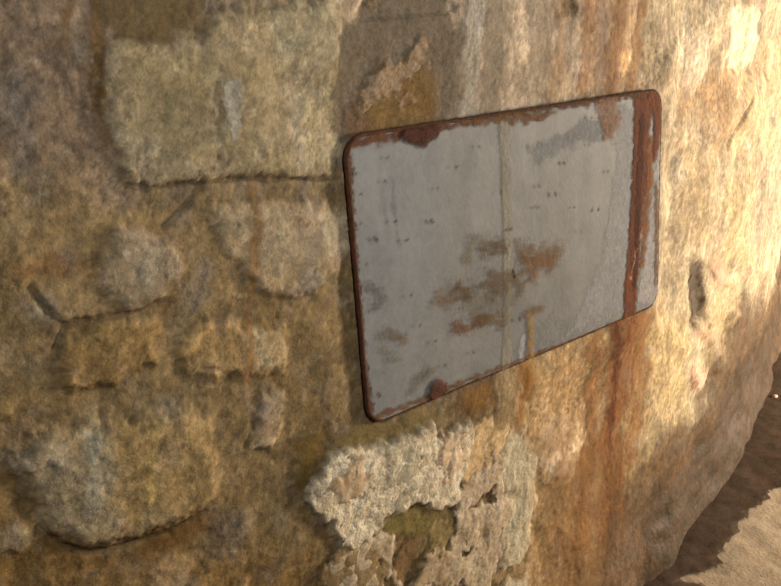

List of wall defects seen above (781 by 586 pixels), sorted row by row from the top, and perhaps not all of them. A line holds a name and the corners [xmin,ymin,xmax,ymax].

spalling [306,417,514,586]
rust [349,0,662,586]